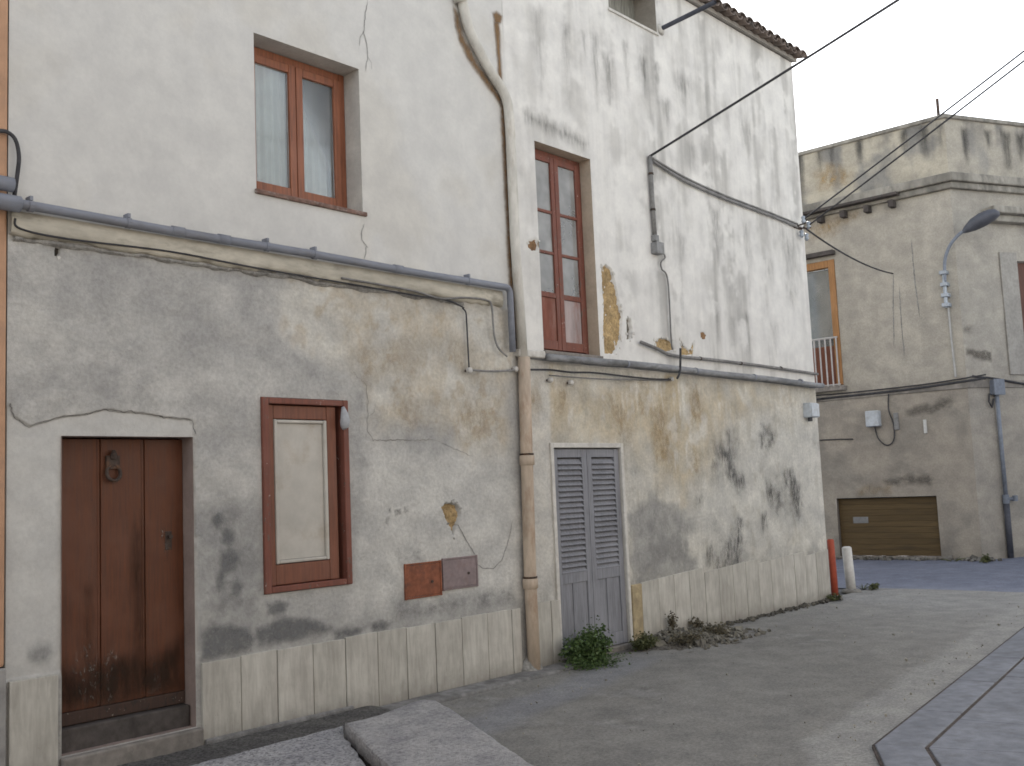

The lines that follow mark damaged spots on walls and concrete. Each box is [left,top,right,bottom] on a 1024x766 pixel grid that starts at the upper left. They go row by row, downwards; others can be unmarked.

crack [359,0,372,65]
flaking render [601,264,635,355]
flaking render [653,337,694,356]
crack [10,403,196,434]
spalling [441,499,462,540]
leakage [215,514,241,589]
leakage [203,603,326,658]